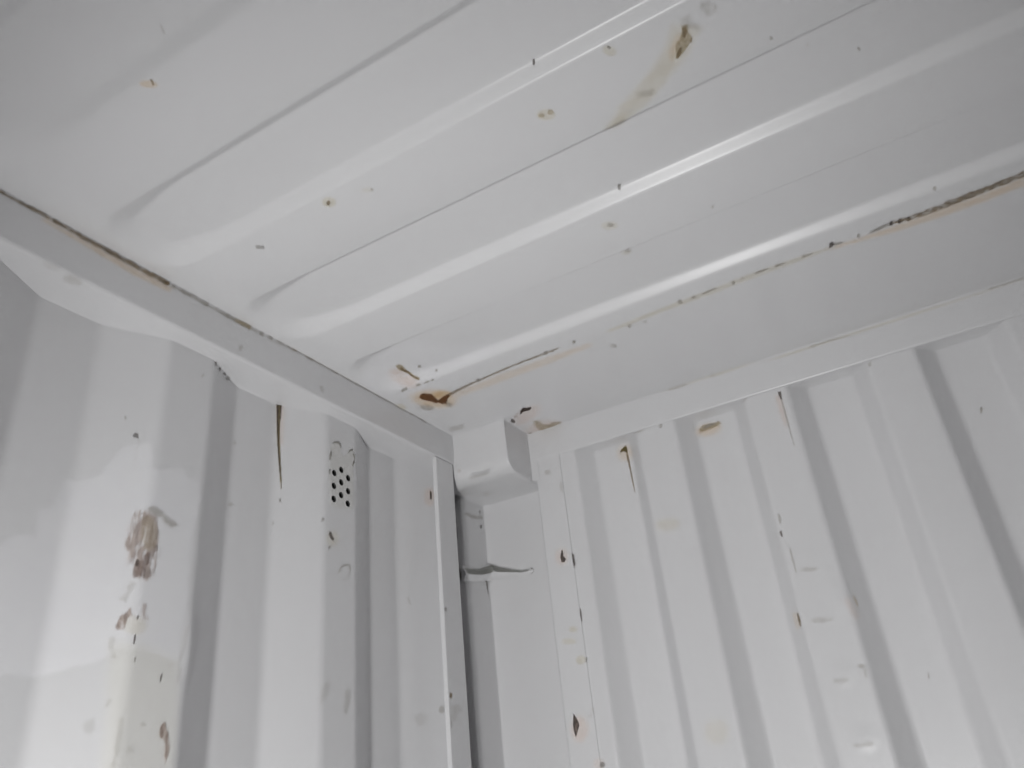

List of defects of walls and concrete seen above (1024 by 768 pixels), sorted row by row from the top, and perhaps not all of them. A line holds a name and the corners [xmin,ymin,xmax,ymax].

leakage [676,25,692,59]
corrosion [396,349,556,404]